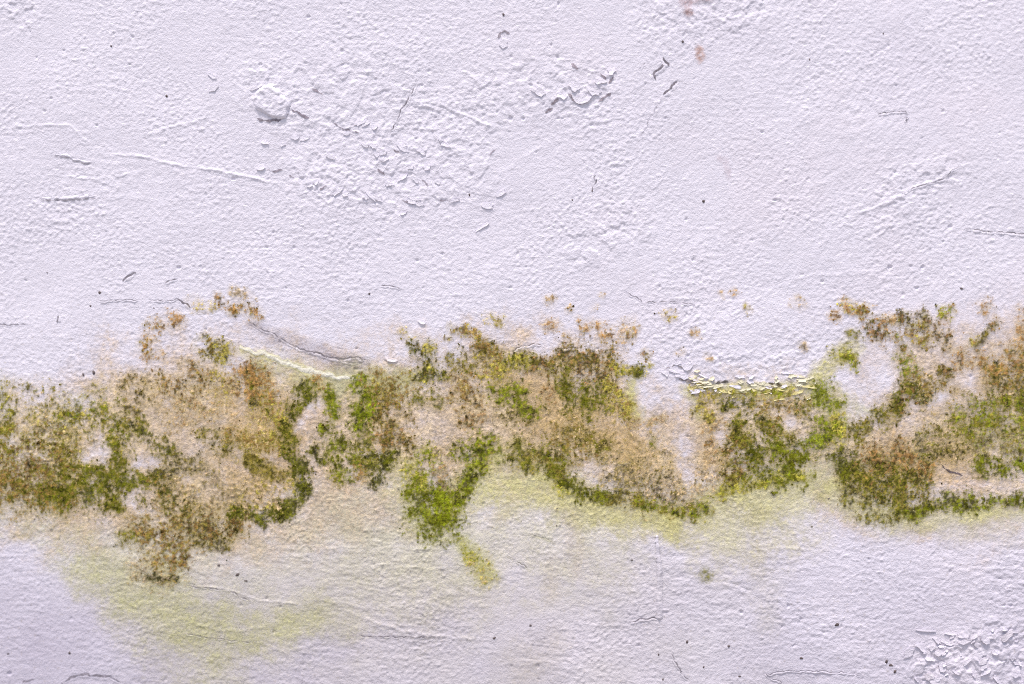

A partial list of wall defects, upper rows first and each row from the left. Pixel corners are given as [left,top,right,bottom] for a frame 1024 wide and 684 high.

peeling [662,361,817,401]
water stain [0,287,1024,554]
peeling [904,628,1024,684]